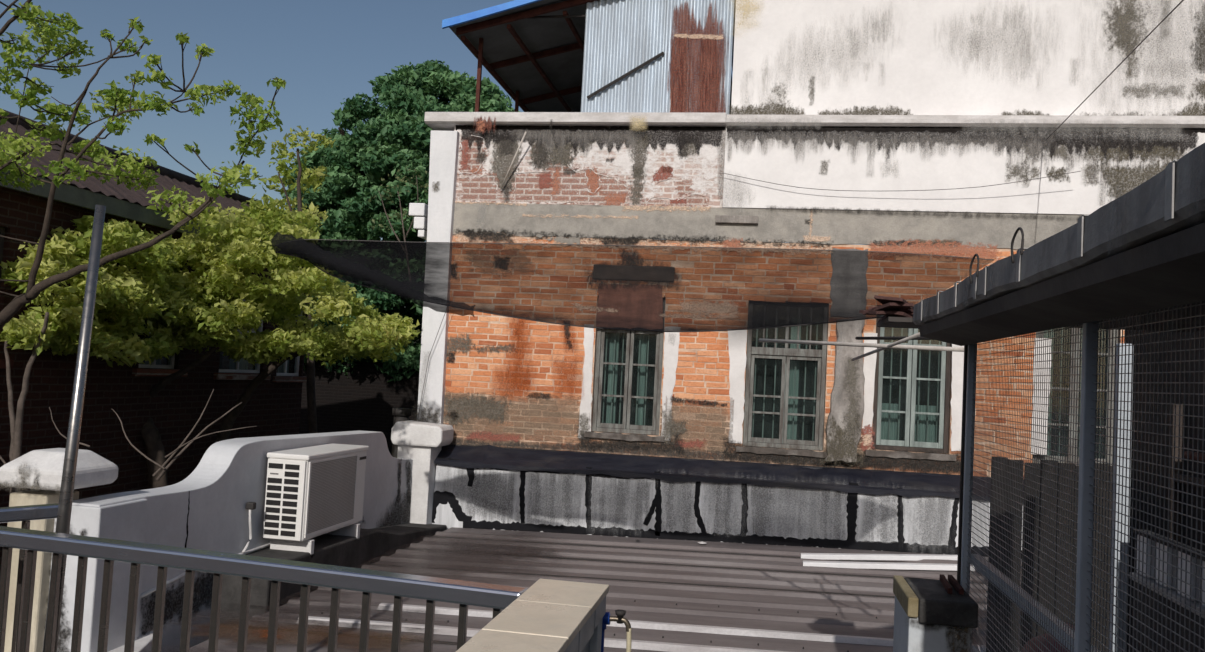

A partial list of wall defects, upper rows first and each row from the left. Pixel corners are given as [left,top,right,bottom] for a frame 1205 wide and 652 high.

corrosion [667,1,729,113]
leakage [456,0,1205,233]
flaking render [452,134,831,250]
leakage [723,357,961,473]
crack [183,491,191,548]
crack [432,457,989,557]